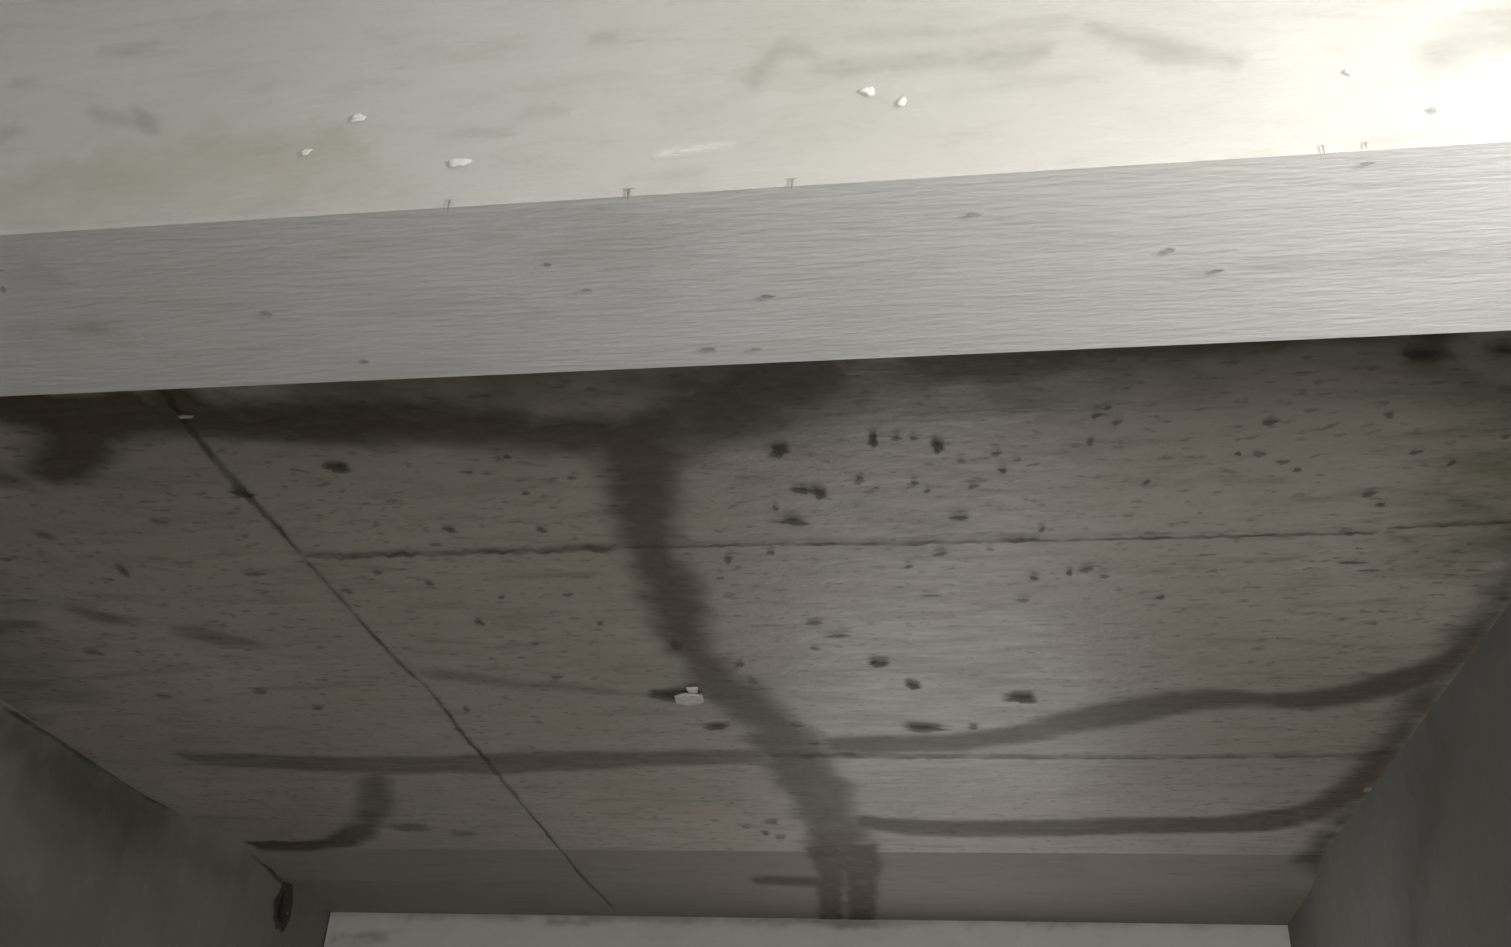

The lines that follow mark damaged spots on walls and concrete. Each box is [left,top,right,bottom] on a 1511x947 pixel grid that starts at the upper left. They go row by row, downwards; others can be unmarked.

damp [901,340,1296,379]
damp [1405,333,1451,361]
crack [168,398,214,459]
crack [238,486,314,568]
crack [349,538,1039,558]
crack [1106,533,1274,541]
crack [1344,521,1511,535]
crack [338,596,414,676]
damp [0,360,1488,920]
crack [11,712,159,803]
crack [440,704,486,760]
crack [533,818,607,902]